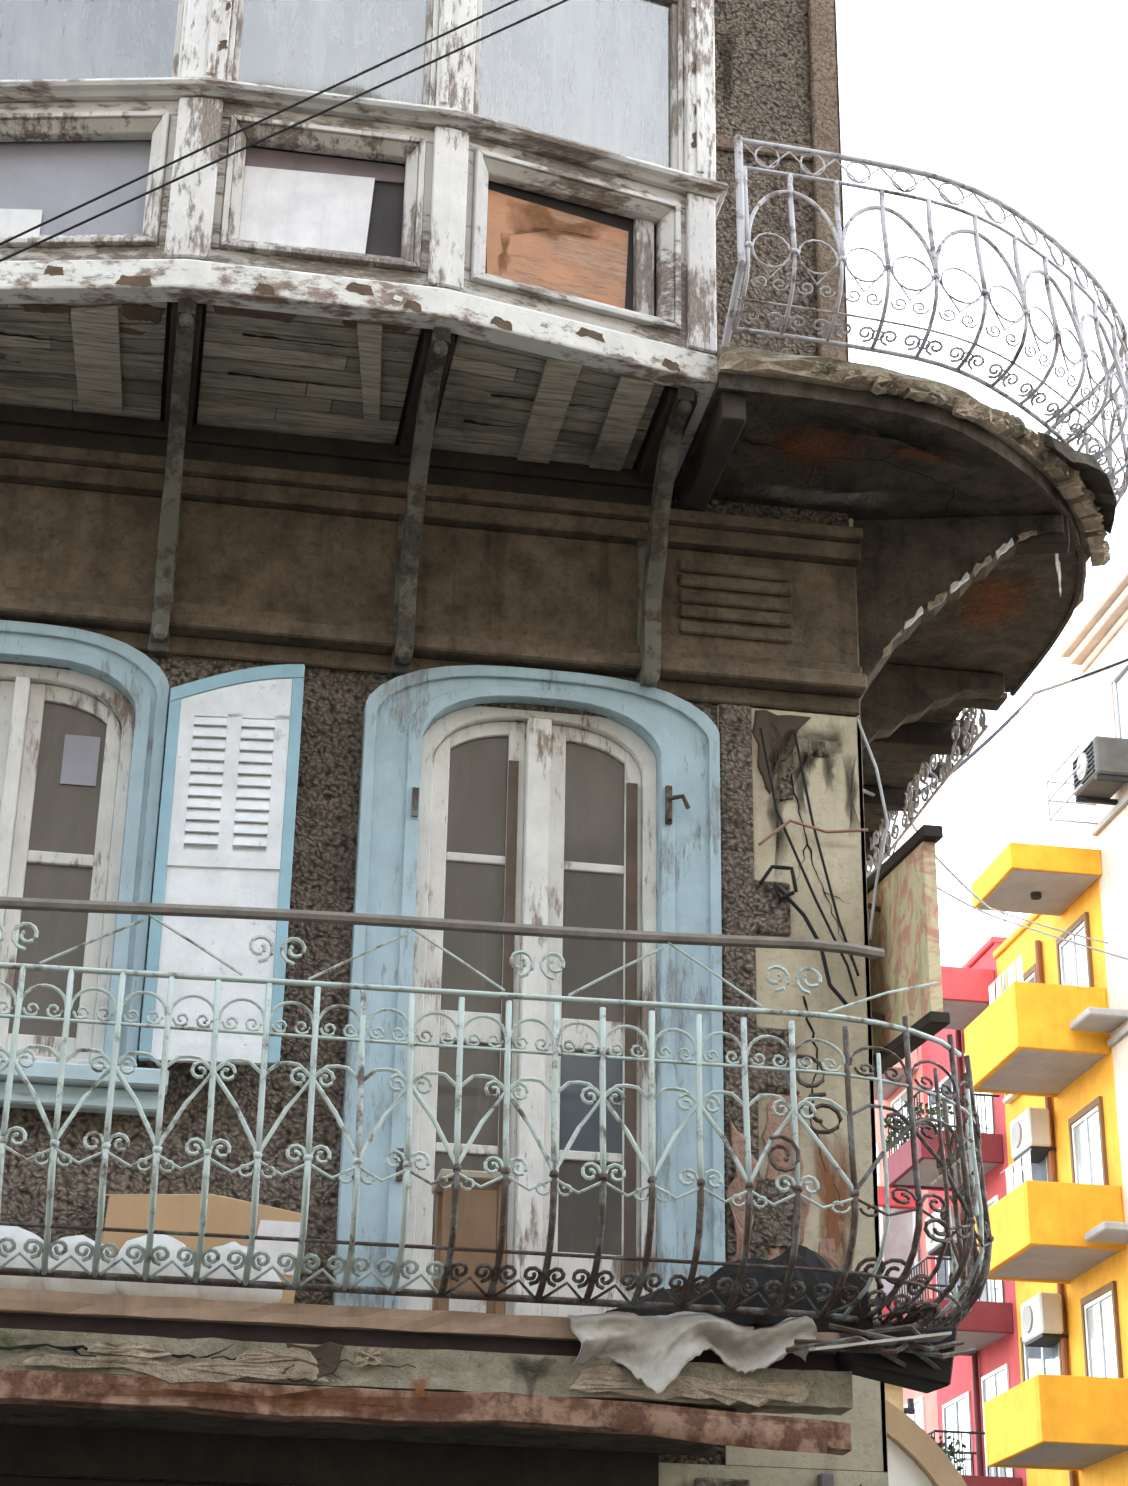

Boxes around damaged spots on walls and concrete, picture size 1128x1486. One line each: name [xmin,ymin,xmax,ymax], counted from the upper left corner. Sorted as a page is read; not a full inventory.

peeling [21,303,76,314]
peeling [34,262,64,276]
peeling [105,272,165,335]
peeling [213,278,297,323]
peeling [334,278,374,295]
peeling [382,295,422,334]
peeling [480,310,512,331]
peeling [566,320,606,343]
peeling [653,353,681,372]
spalling [812,361,1117,567]
spalling [9,1341,385,1384]
spalling [569,1365,814,1407]